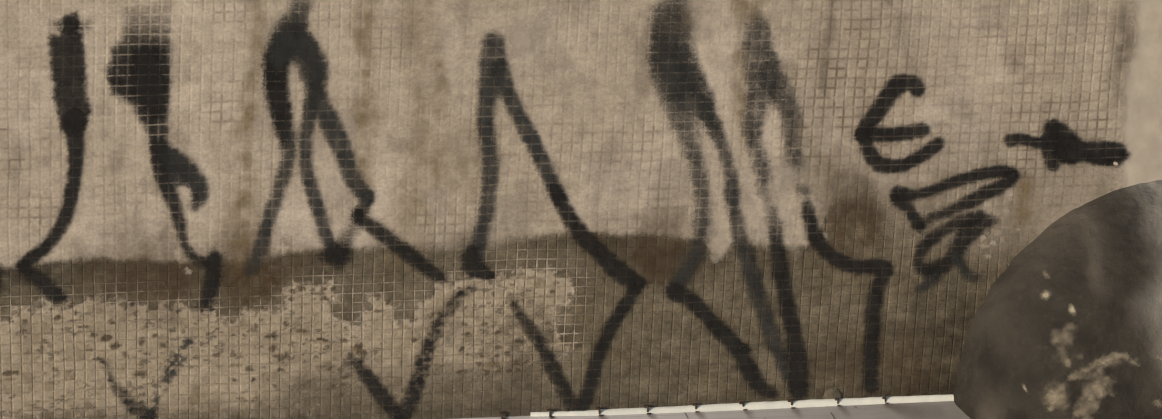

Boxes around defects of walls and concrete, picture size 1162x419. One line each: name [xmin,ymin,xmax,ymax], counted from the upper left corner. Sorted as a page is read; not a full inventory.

peeling [0,249,587,419]